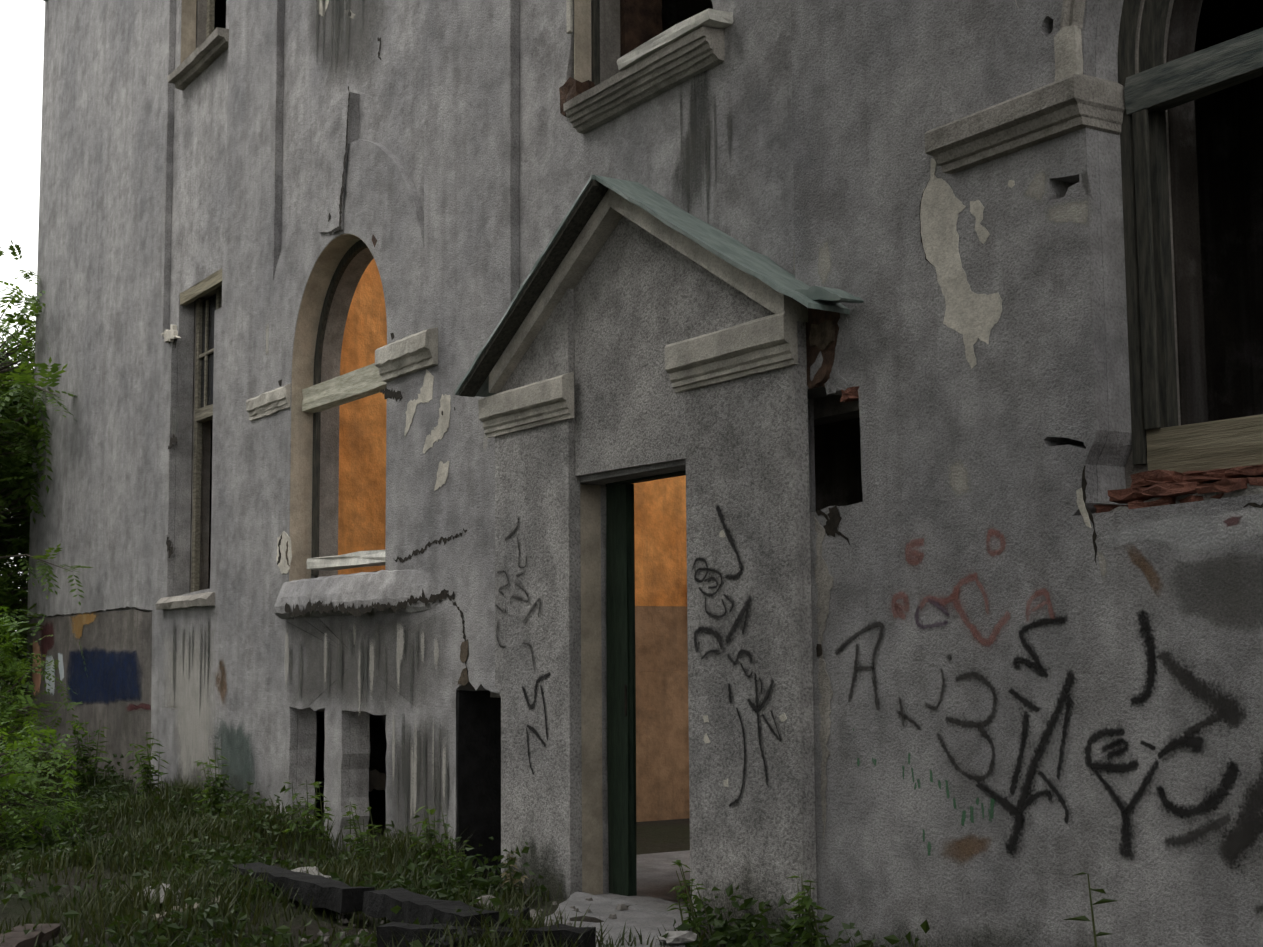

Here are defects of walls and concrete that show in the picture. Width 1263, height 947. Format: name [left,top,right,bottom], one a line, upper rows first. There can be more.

peeling [919,159,1002,369]
spalling [806,308,859,403]
peeling [404,369,456,454]
crack [394,528,467,563]
peeling [434,461,449,491]
crack [1076,466,1107,576]
leakage [285,619,439,708]
crack [285,589,469,686]
leakage [392,720,449,845]